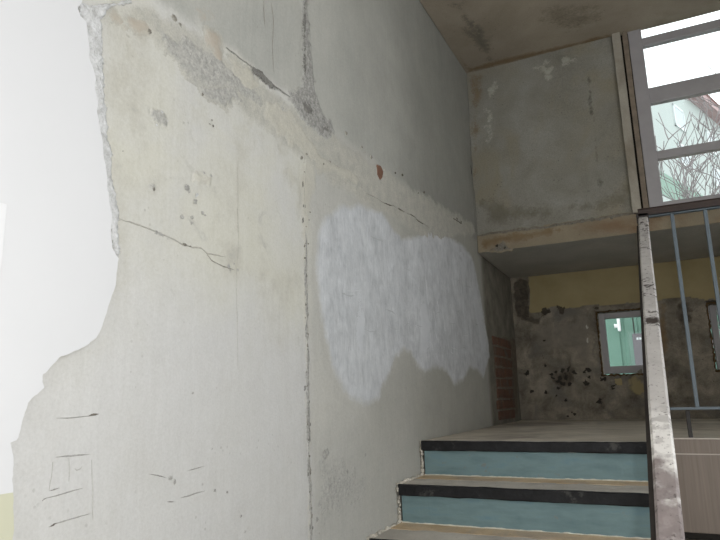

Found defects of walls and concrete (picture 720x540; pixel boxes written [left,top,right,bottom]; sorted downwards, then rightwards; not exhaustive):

crack [226,8,290,97]
crack [368,194,430,228]
peeling [0,0,132,540]
crack [121,211,239,361]
crack [298,153,318,540]
damp [473,287,486,354]
peeling [512,265,640,324]
peeling [653,256,720,339]